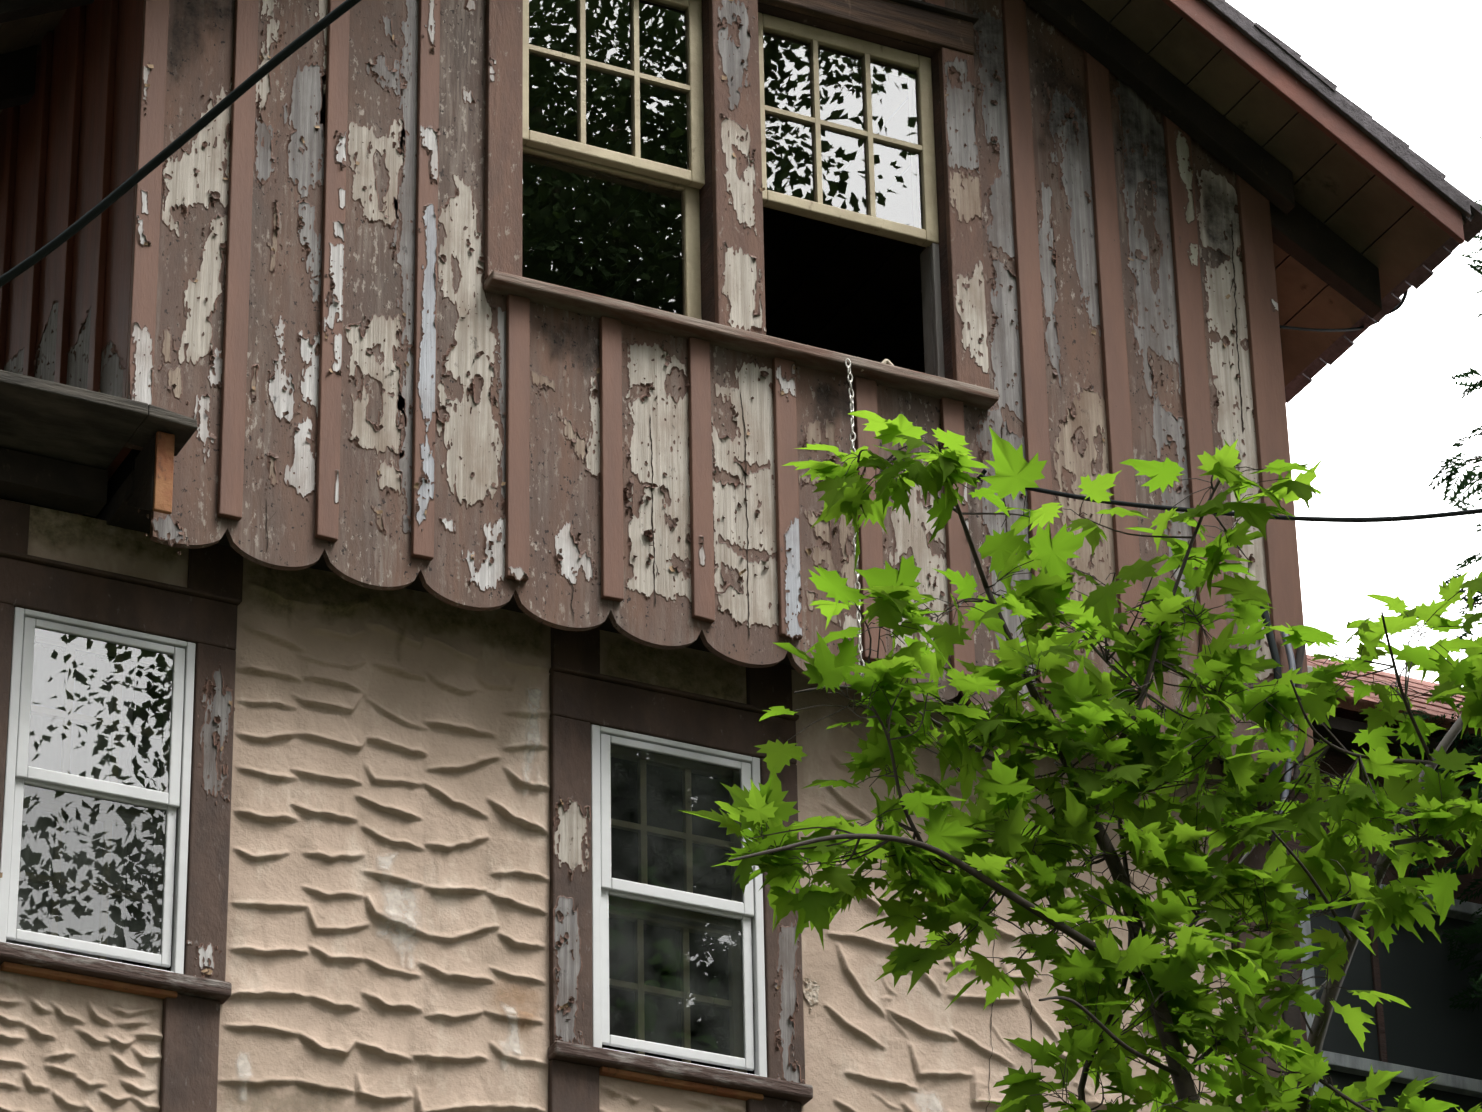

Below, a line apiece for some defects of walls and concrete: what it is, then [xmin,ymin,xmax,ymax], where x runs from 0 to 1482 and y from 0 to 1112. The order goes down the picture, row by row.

peeling [4,82,232,465]
peeling [197,661,235,806]
peeling [250,0,529,592]
peeling [714,0,767,334]
peeling [623,338,861,641]
peeling [883,469,951,660]
peeling [943,10,1032,664]
peeling [997,664,1045,704]
peeling [1036,82,1119,653]
peeling [1111,74,1274,681]
peeling [553,792,591,1045]